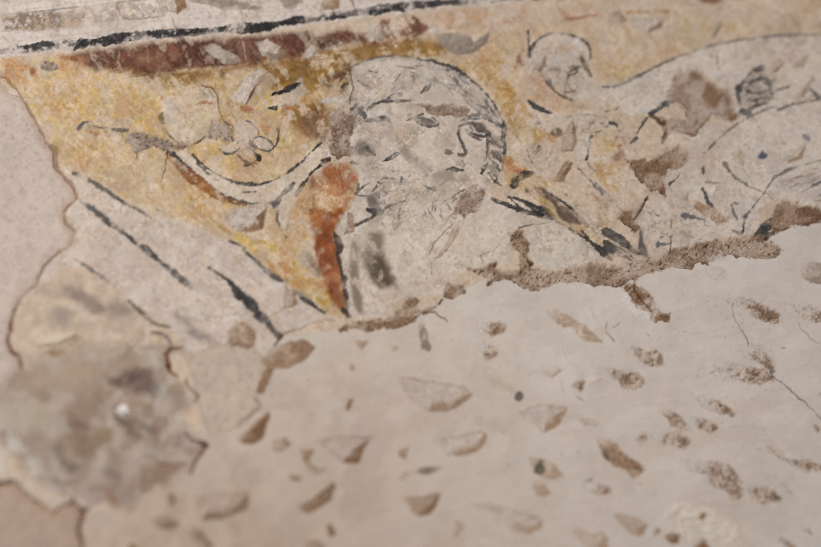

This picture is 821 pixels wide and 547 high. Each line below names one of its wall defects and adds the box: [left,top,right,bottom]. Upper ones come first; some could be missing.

flaking render [655,69,740,138]
crack [0,76,79,370]
flaking render [616,144,691,234]
flaking render [467,198,821,324]
flaking render [339,281,467,333]
crack [770,370,821,419]
crack [73,496,90,547]